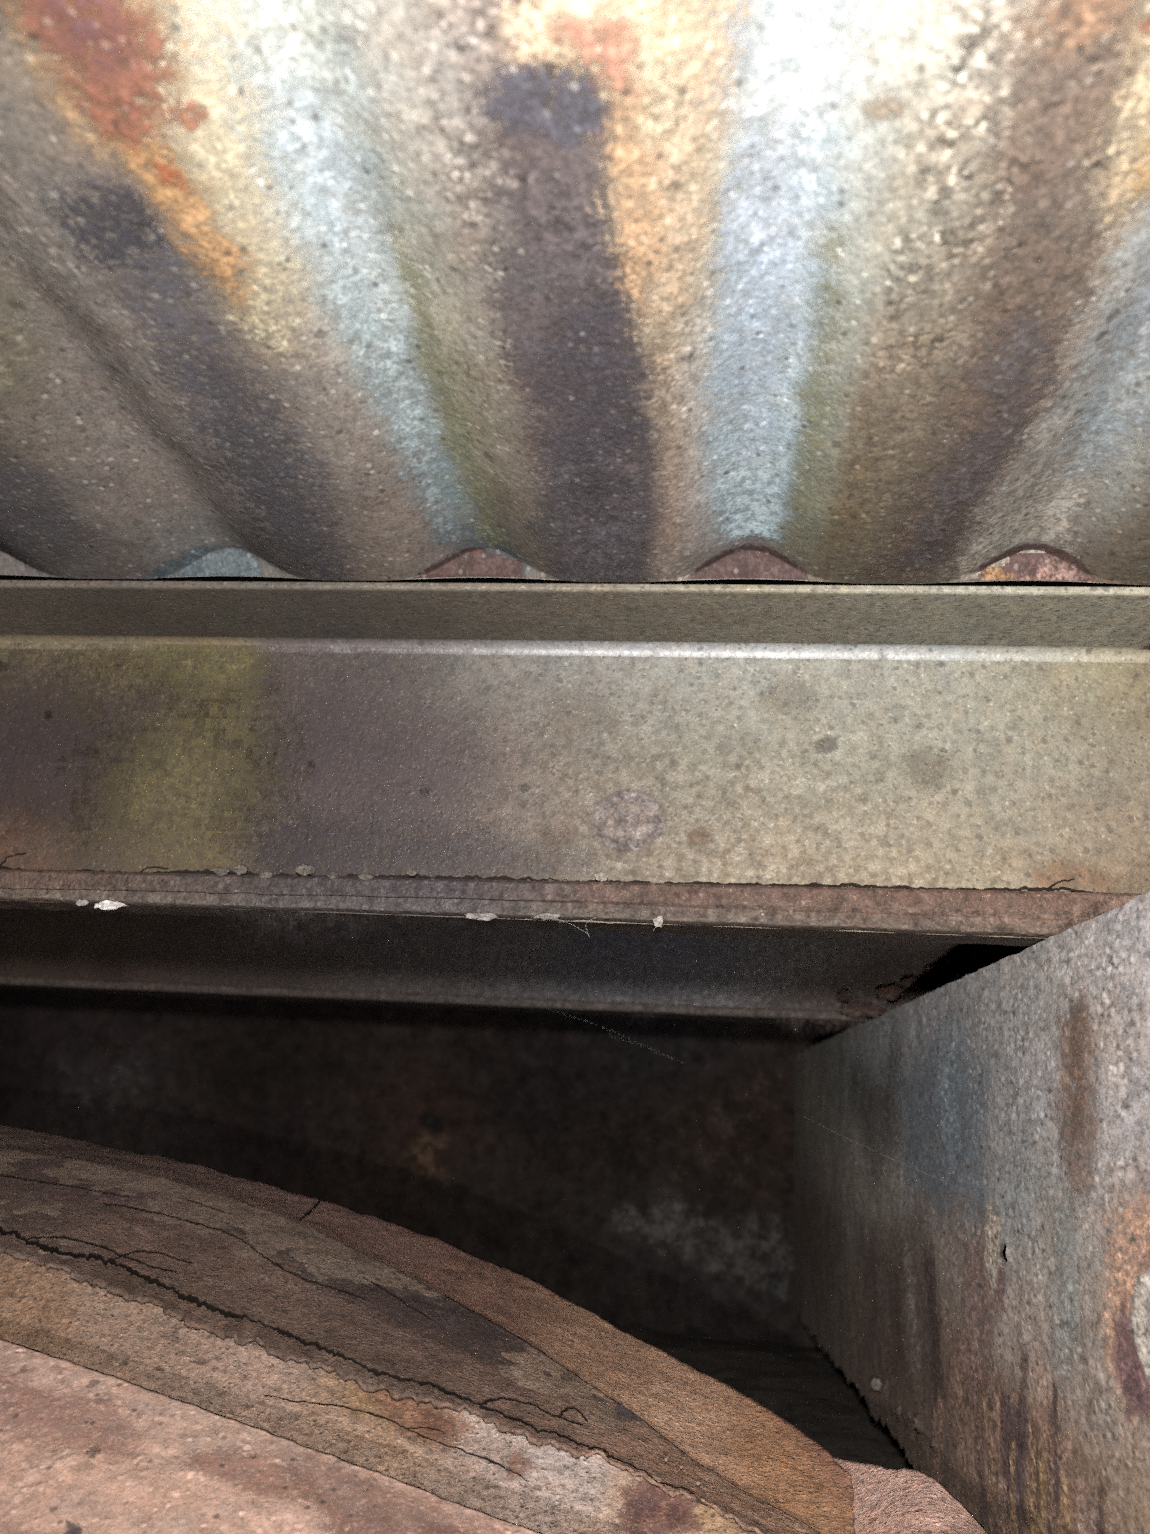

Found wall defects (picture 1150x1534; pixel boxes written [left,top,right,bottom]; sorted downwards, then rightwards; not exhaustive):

rust [0,0,252,307]
damp [56,0,657,583]
damp [957,205,1150,581]
rust [583,860,1104,910]
rust [1054,984,1097,1198]
crack [0,1175,695,1495]
rust [871,1203,1108,1534]
rust [1100,1196,1150,1428]